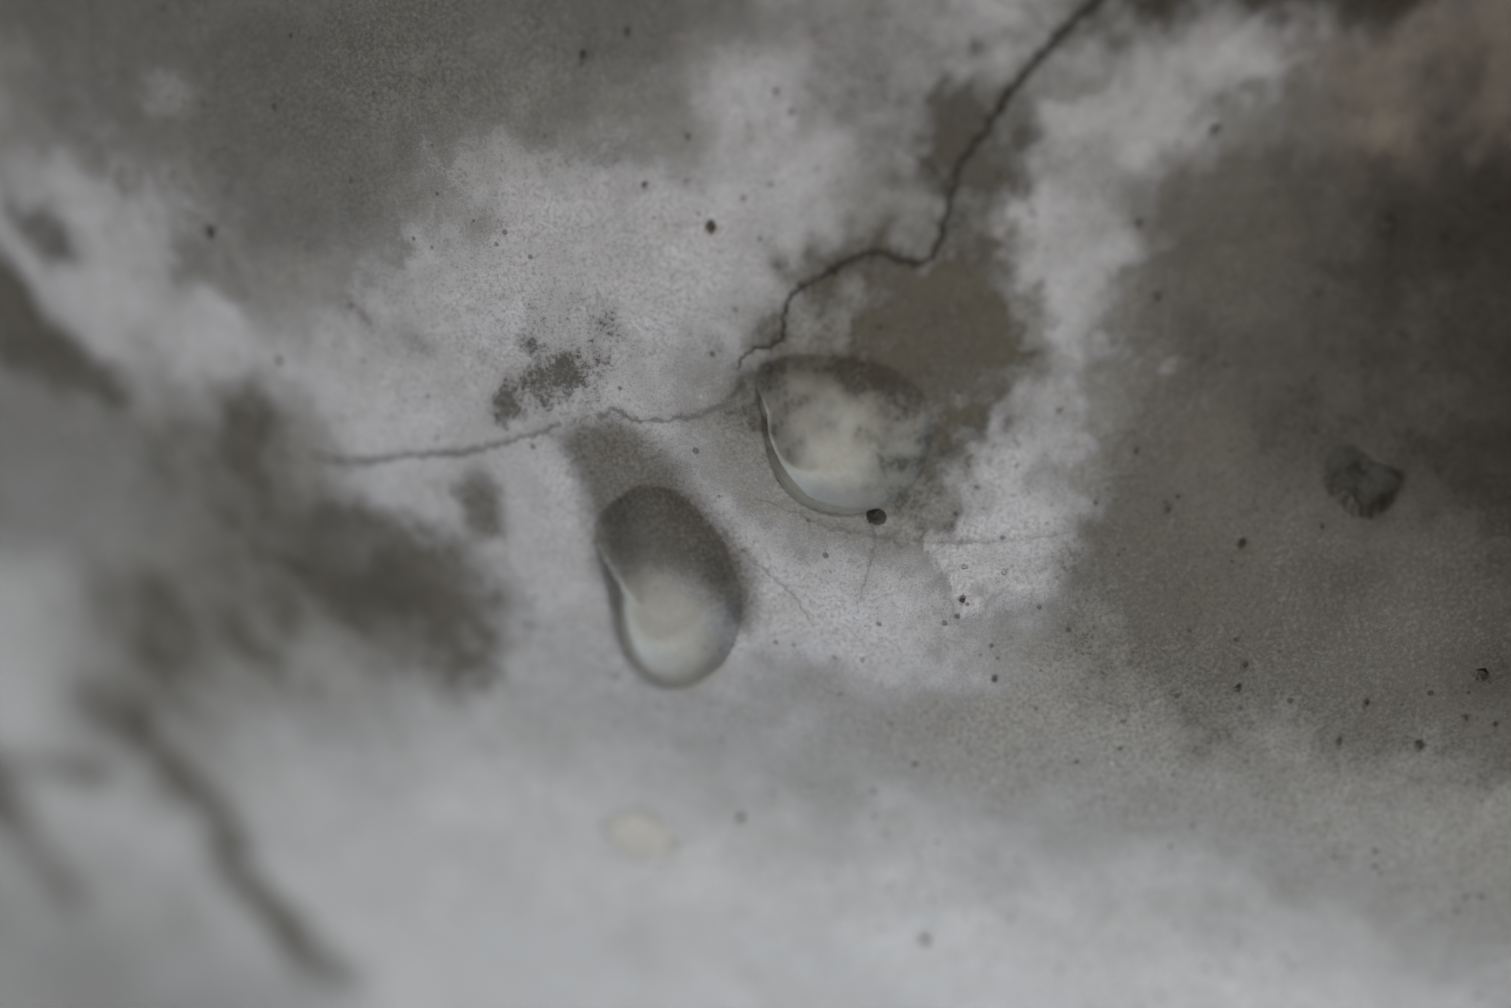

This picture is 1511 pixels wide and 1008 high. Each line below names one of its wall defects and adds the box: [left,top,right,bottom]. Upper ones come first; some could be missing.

crack [737,0,1105,371]
spalling [1320,443,1406,520]